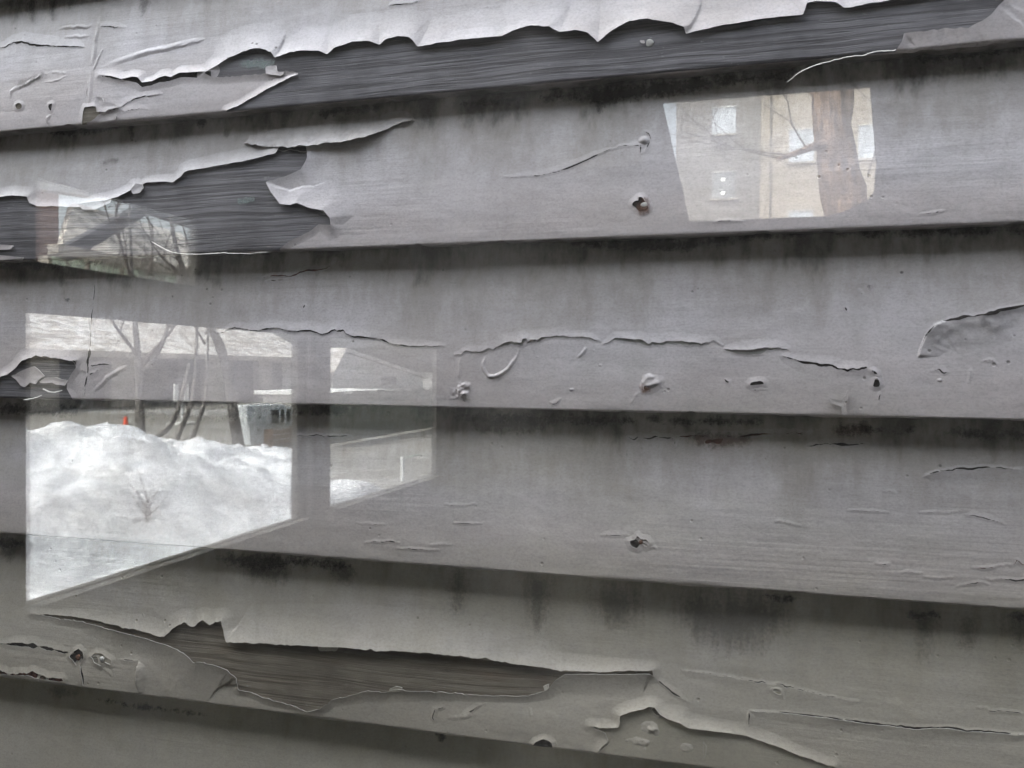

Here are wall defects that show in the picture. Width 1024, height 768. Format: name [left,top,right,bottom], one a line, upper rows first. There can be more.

peeling [78,0,1024,125]
peeling [0,111,416,261]
damp [585,233,794,252]
damp [901,227,996,236]
peeling [0,342,114,400]
crack [213,319,885,406]
peeling [916,303,1024,384]
damp [1,402,77,416]
damp [140,405,345,422]
peeling [600,530,658,554]
peeling [0,603,689,725]
spalling [526,733,559,749]